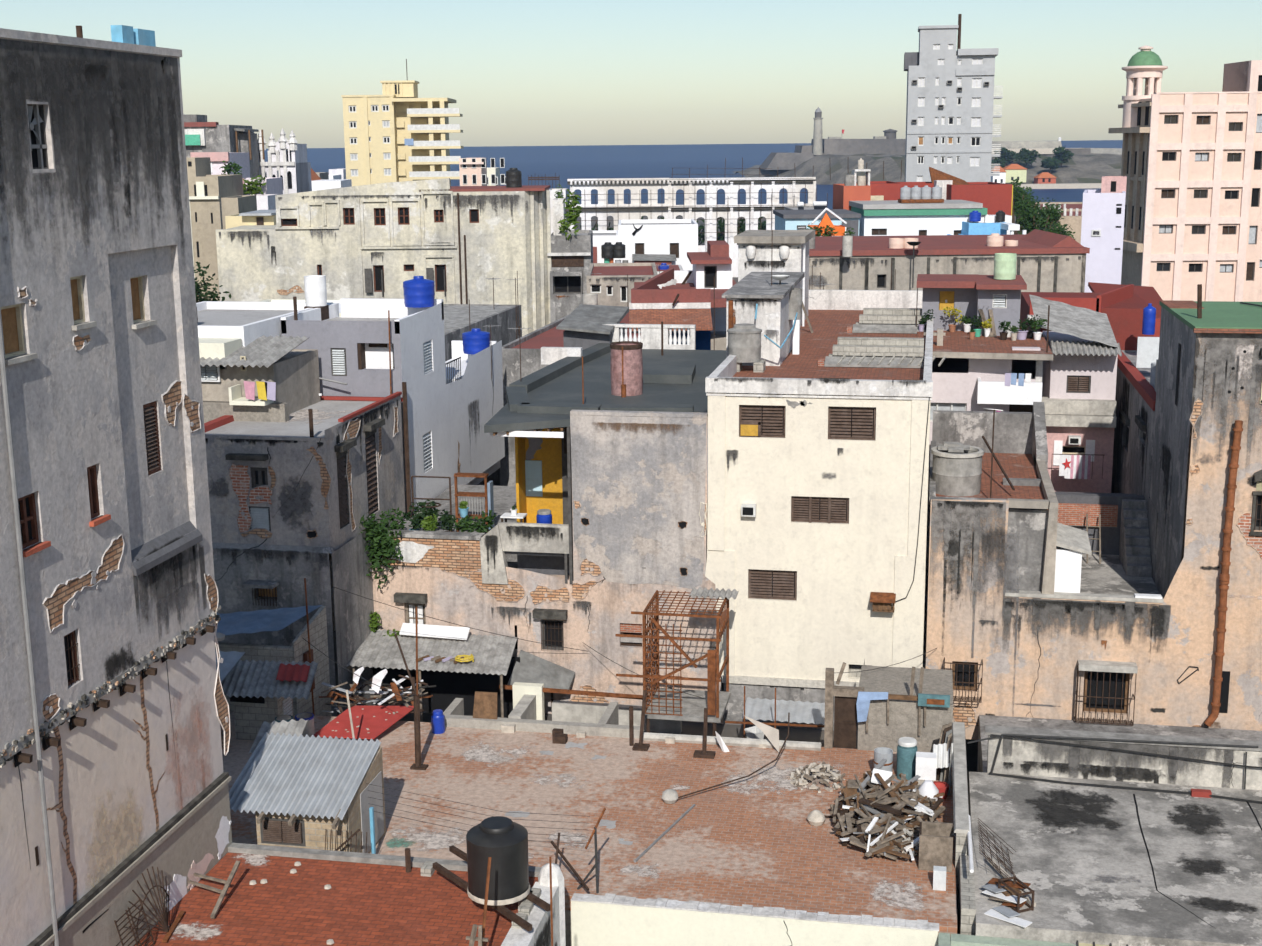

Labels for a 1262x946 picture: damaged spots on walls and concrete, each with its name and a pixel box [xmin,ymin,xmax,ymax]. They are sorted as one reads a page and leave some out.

leakage [0,39,184,245]
spalling [161,380,201,433]
spalling [42,534,124,633]
spalling [228,462,277,540]
leakage [278,479,313,527]
spalling [305,418,361,532]
peeling [388,541,435,563]
spalling [438,558,604,605]
leakage [930,500,1171,658]
spalling [1236,512,1262,559]
leakage [1003,737,1234,835]